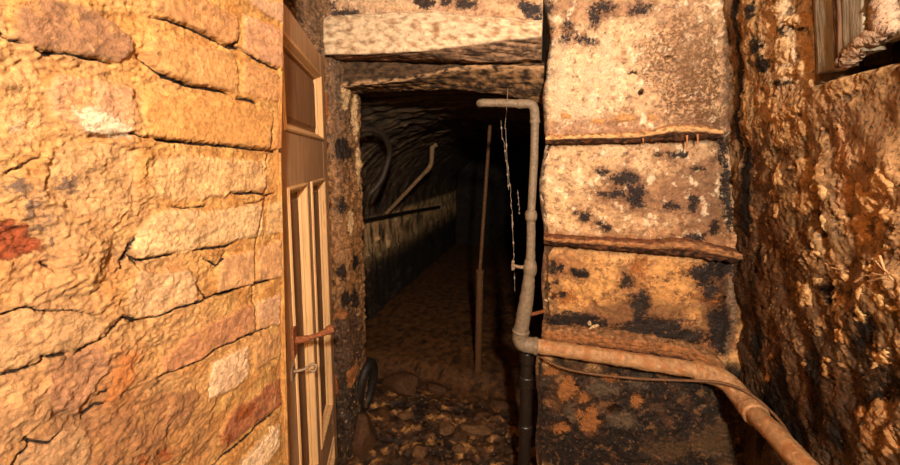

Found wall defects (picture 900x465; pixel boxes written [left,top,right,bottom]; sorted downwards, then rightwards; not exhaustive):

leakage [413,0,478,11]
crack [0,32,109,65]
crack [137,59,256,104]
crack [150,17,277,70]
leakage [518,0,654,120]
leakage [574,211,612,231]
leakage [595,169,647,209]
leakage [662,195,701,213]
crack [0,280,269,375]
leakage [544,260,737,357]
crack [15,434,57,456]
crack [212,413,272,465]